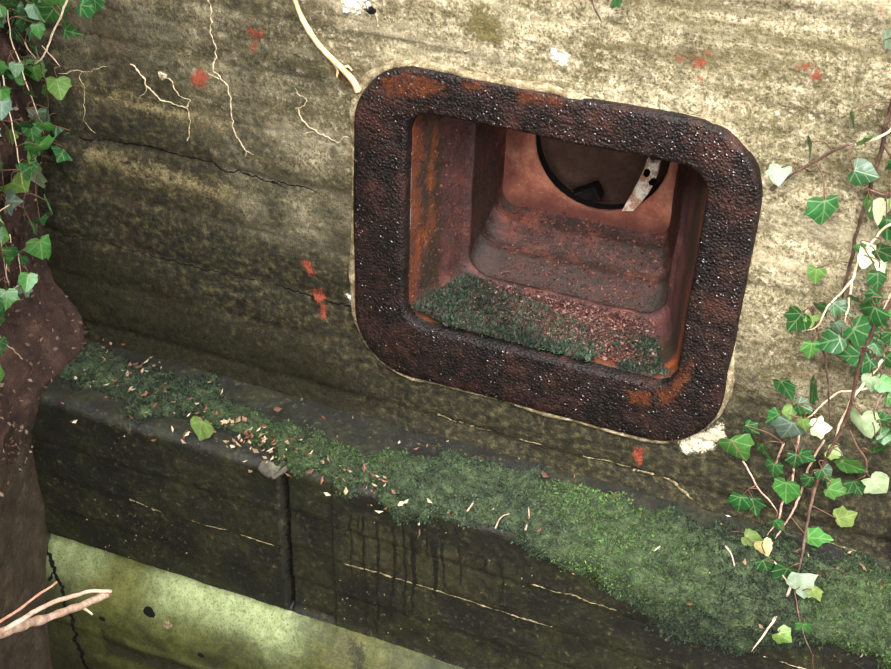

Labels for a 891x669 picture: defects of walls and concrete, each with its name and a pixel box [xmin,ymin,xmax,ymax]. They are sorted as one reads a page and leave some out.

crack [58,0,317,193]
corrosion [191,69,209,89]
corrosion [310,288,327,318]
crack [47,547,90,669]
damp [348,514,445,634]